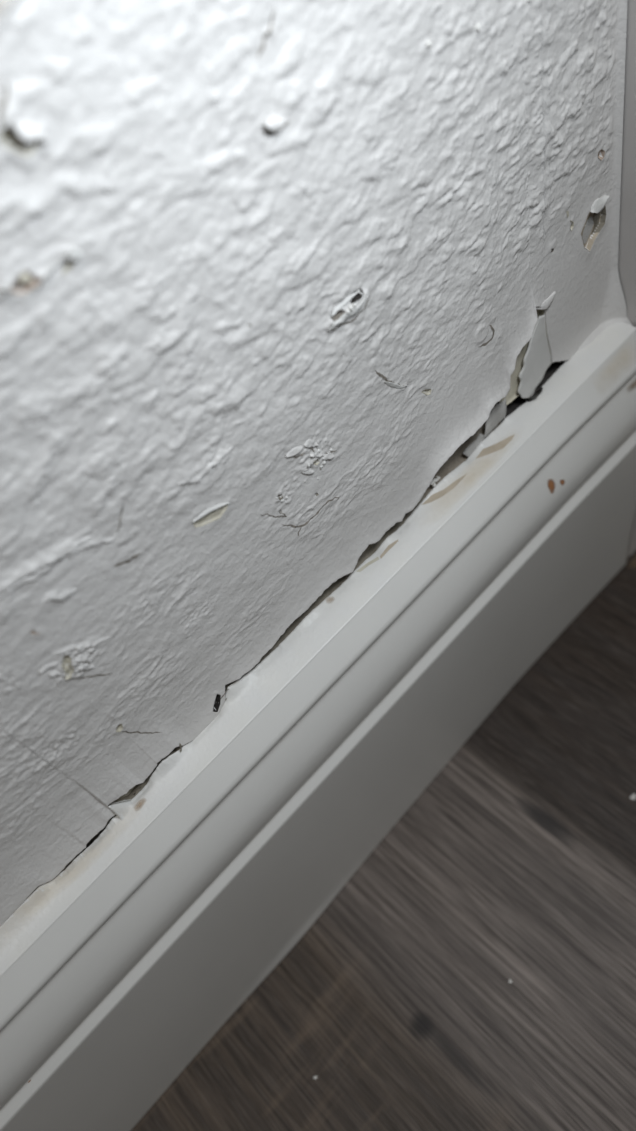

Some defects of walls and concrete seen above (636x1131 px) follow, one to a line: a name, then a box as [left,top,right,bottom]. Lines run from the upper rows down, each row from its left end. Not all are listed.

spalling [590,195,610,235]
peeling [328,289,370,330]
spalling [284,439,335,482]
peeling [476,434,515,458]
peeling [192,502,230,527]
crack [213,291,563,712]
peeling [422,474,467,505]
crack [114,553,140,567]
crack [106,731,184,827]